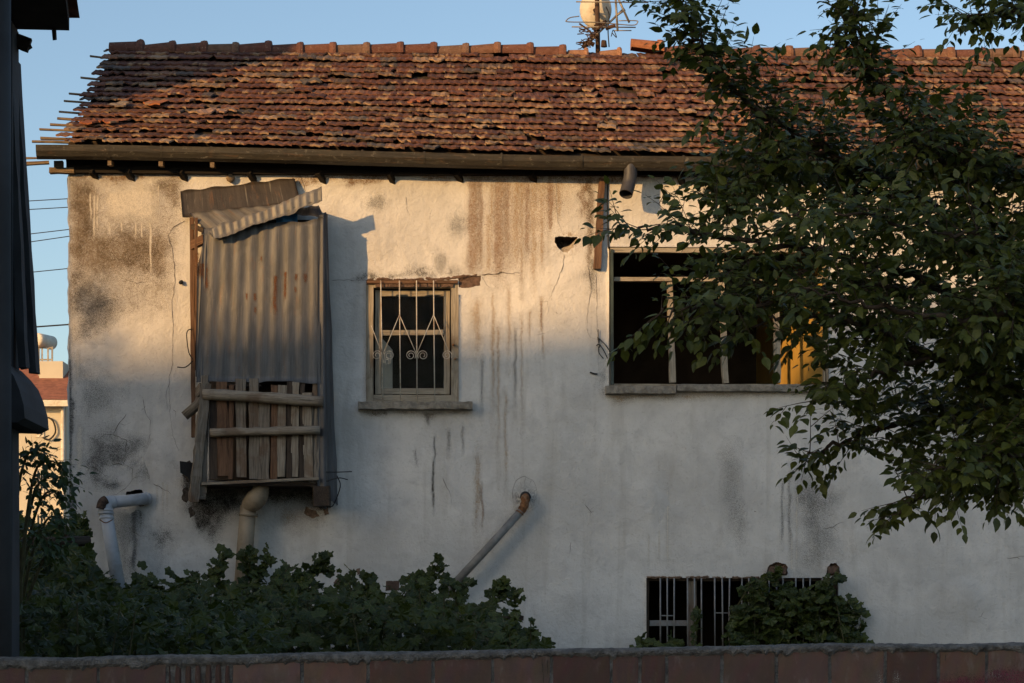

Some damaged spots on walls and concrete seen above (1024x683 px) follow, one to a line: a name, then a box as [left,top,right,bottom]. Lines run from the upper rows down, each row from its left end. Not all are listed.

crack [87,221,184,495]
damp [69,174,252,581]
spalling [367,274,481,288]
damp [287,175,622,510]
spalling [555,236,577,253]
spalling [182,475,195,518]
damp [364,410,488,549]